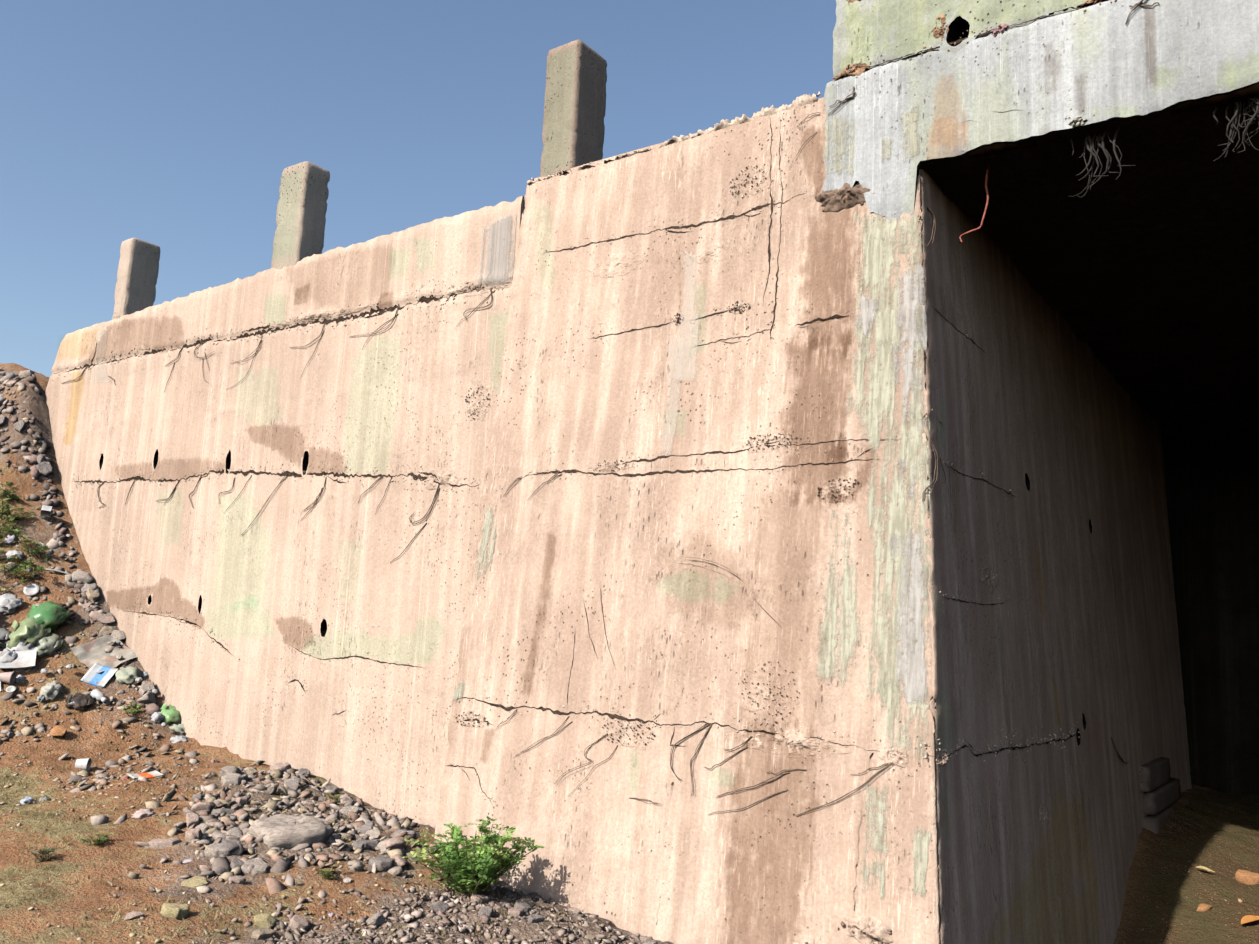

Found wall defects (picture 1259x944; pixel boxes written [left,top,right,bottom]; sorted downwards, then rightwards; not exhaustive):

crack [541,123,851,351]
crack [52,276,513,381]
crack [71,429,900,496]
leakage [847,265,931,758]
crack [943,458,1016,504]
crack [282,639,423,700]
crack [449,588,881,754]
crack [920,721,1083,765]
crack [444,763,496,805]
leakage [913,828,931,896]